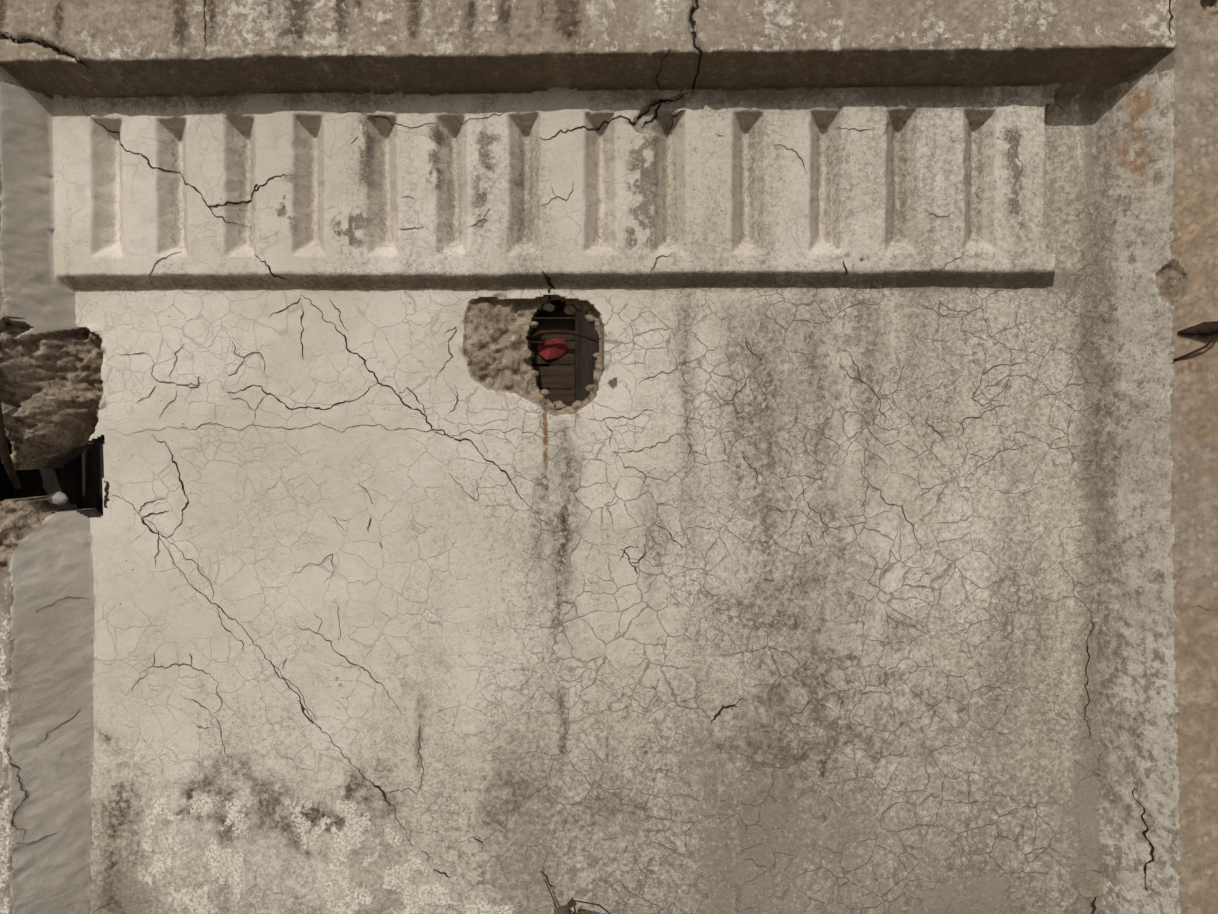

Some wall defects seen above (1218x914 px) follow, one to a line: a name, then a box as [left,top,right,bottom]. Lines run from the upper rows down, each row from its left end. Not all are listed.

crack [0,32,89,70]
crack [541,0,702,140]
spalling [1200,0,1218,24]
crack [83,109,290,227]
spalling [463,295,617,416]
spalling [0,318,105,576]
leakage [557,431,574,571]
crack [104,252,930,878]
crack [4,708,81,844]
leakage [176,774,345,852]
leakage [345,775,369,804]
crack [1132,789,1155,891]